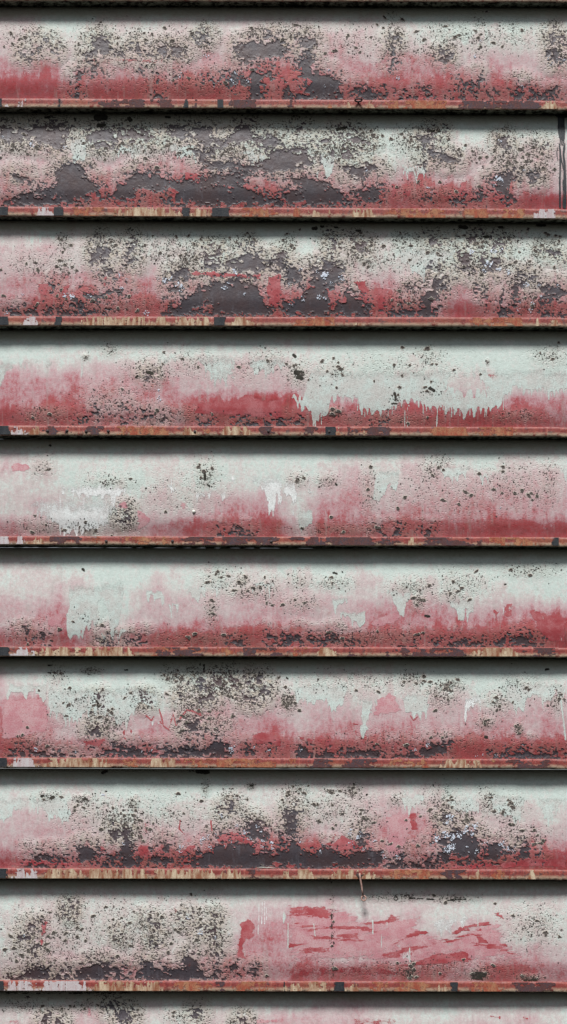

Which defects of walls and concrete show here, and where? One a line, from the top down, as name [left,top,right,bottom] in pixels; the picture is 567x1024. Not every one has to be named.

peeling [0,15,563,209]
corrosion [72,207,210,216]
peeling [3,227,567,318]
corrosion [81,317,214,325]
corrosion [35,647,134,656]
peeling [1,669,460,768]
corrosion [37,758,297,767]
peeling [2,784,566,879]
corrosion [40,869,245,879]
corrosion [283,869,432,879]
peeling [2,892,263,991]
peeling [287,902,523,980]